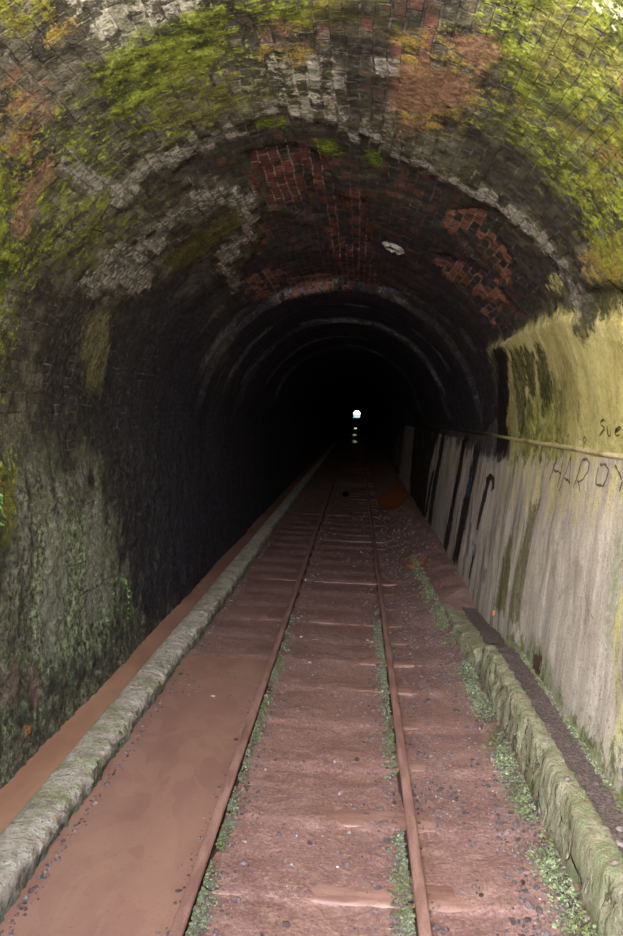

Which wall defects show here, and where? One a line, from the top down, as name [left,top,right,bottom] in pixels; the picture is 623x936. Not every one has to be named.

leakage [52,150,119,205]
leakage [81,177,258,296]
leakage [493,319,623,466]